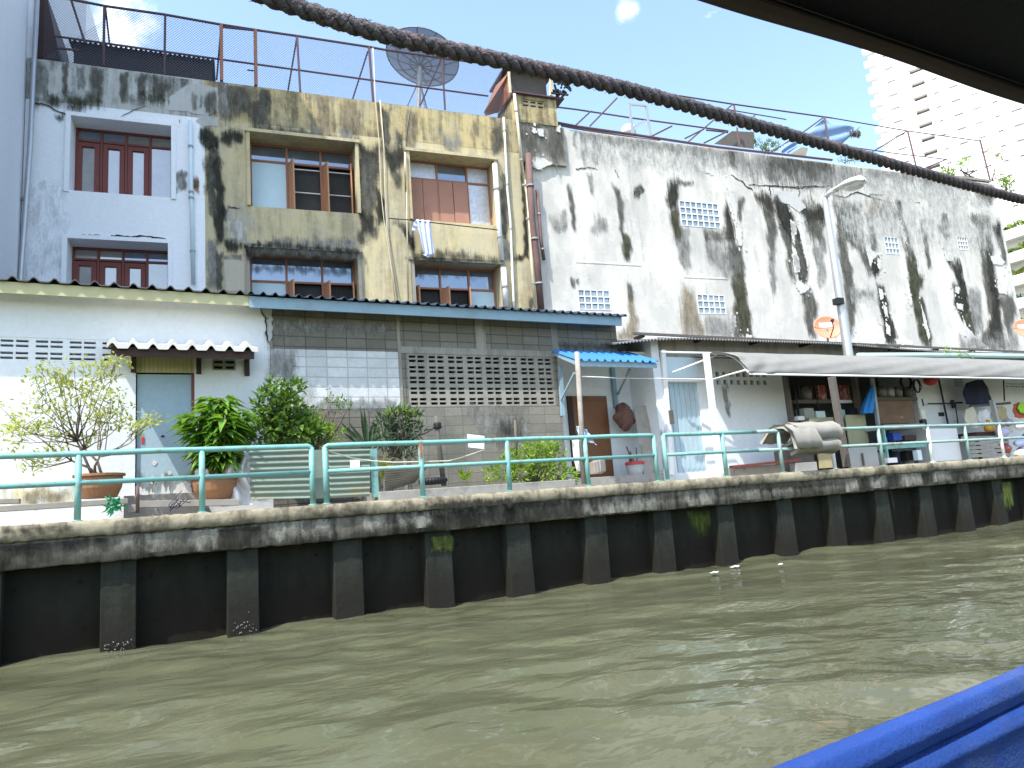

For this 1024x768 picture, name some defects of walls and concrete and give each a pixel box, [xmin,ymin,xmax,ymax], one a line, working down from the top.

water stain [35,63,104,111]
crack [82,232,165,240]
water stain [120,72,1018,351]
peeling [789,210,812,297]
crack [700,171,920,251]
peeling [853,232,913,345]